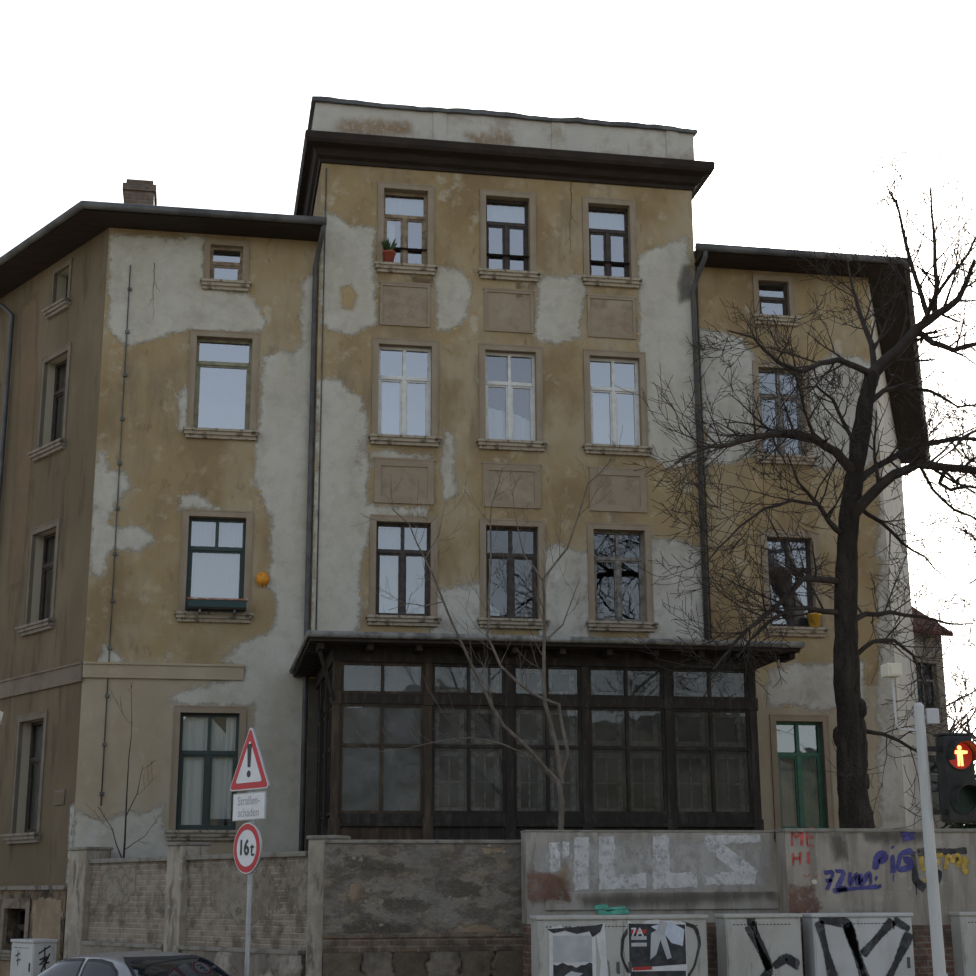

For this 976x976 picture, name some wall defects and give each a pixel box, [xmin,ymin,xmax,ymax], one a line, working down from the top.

peeling [107,234,269,345]
peeling [434,266,472,331]
peeling [534,275,586,344]
peeling [636,237,756,468]
peeling [89,449,154,576]
peeling [171,211,460,853]
peeling [766,662,836,712]
flaking render [207,862,282,925]